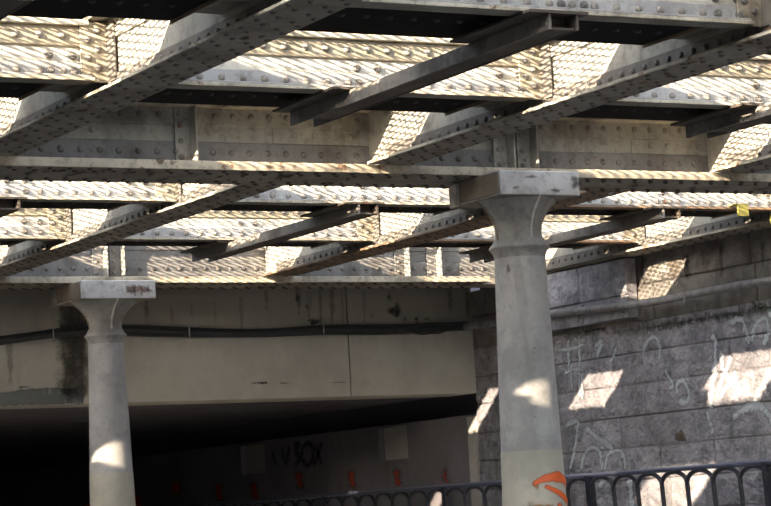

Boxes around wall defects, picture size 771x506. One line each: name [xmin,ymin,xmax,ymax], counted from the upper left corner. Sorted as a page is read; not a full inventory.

damp [57,306,88,396]